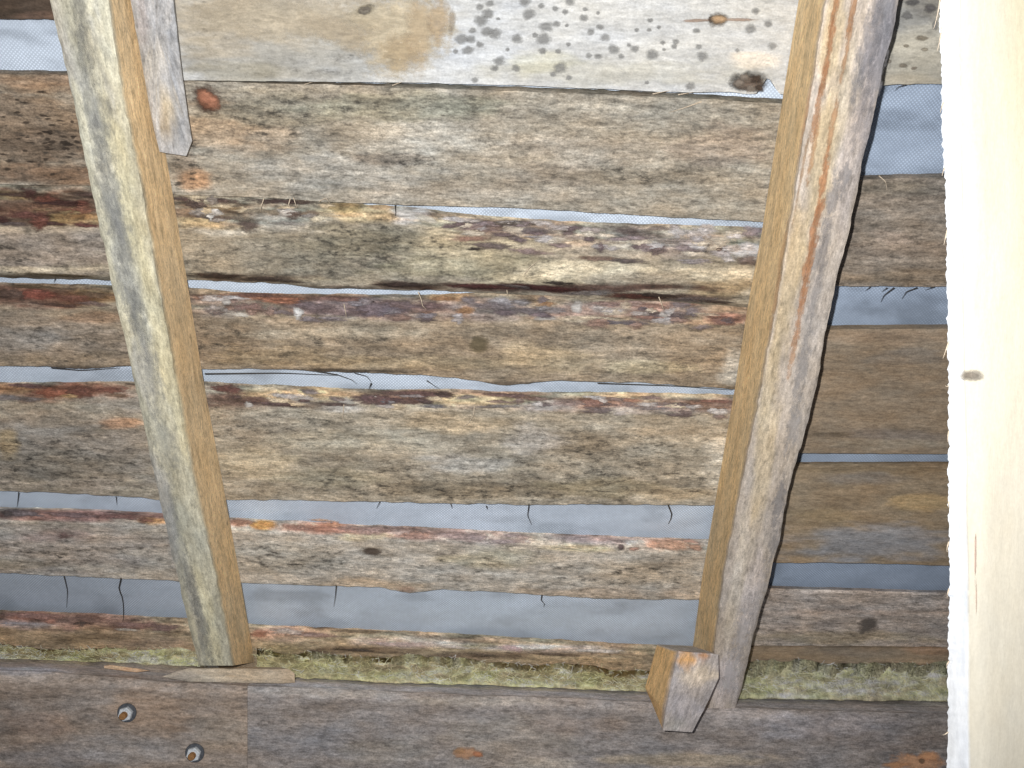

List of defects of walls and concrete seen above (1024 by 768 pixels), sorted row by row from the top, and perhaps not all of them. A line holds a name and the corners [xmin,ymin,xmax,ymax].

damp [214,0,500,72]
damp [492,35,520,71]
damp [521,0,678,79]